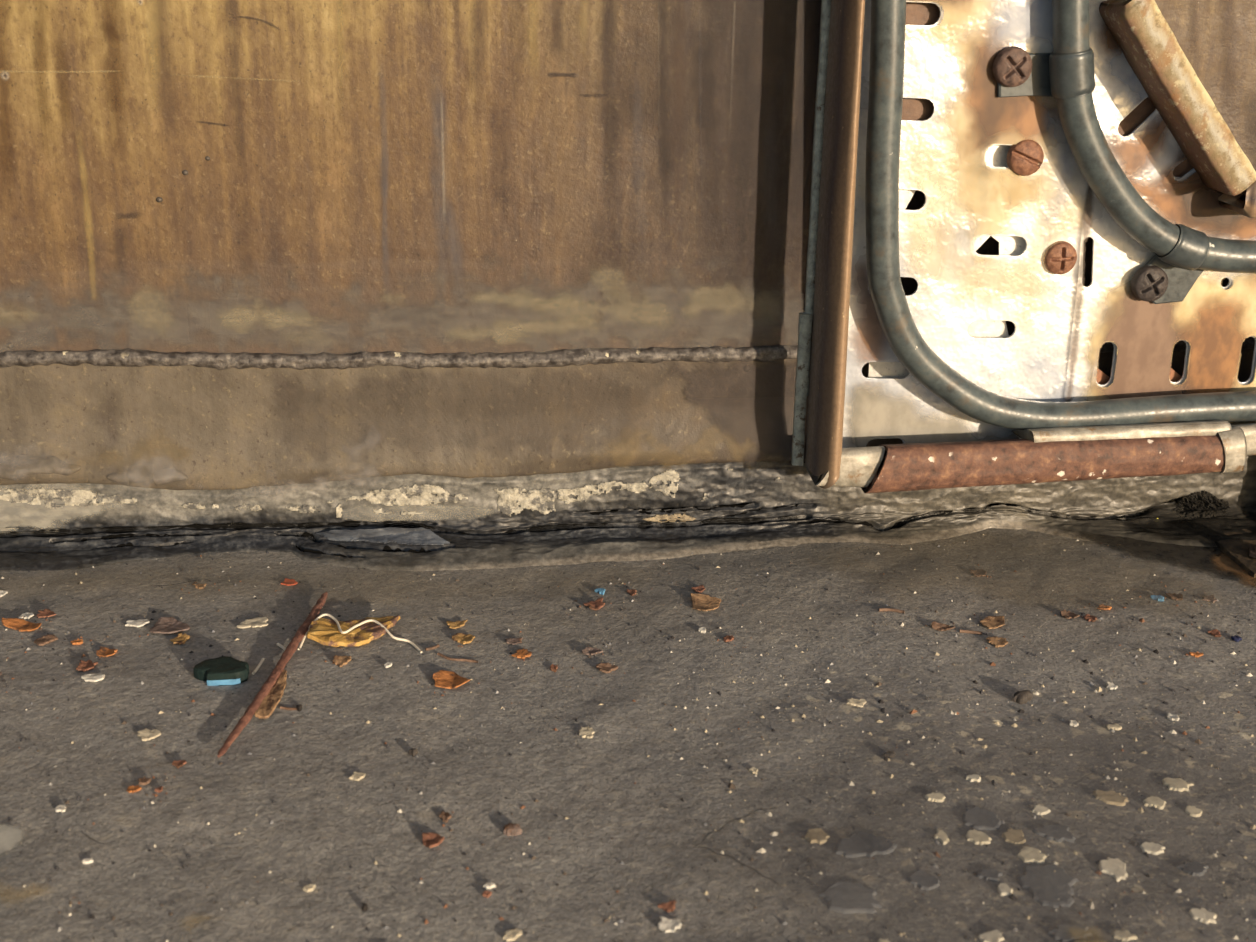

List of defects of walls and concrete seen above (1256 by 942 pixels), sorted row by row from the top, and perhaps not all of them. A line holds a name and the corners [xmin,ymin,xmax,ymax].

rust [1103,23,1123,55]
rust [908,0,1062,236]
rust [1113,118,1256,240]
leakage [0,278,803,354]
rust [861,274,881,358]
rust [1089,274,1256,401]
peeling [0,487,137,509]
peeling [179,502,219,510]
peeling [286,484,468,518]
peeling [495,469,680,516]
spalling [642,513,696,523]